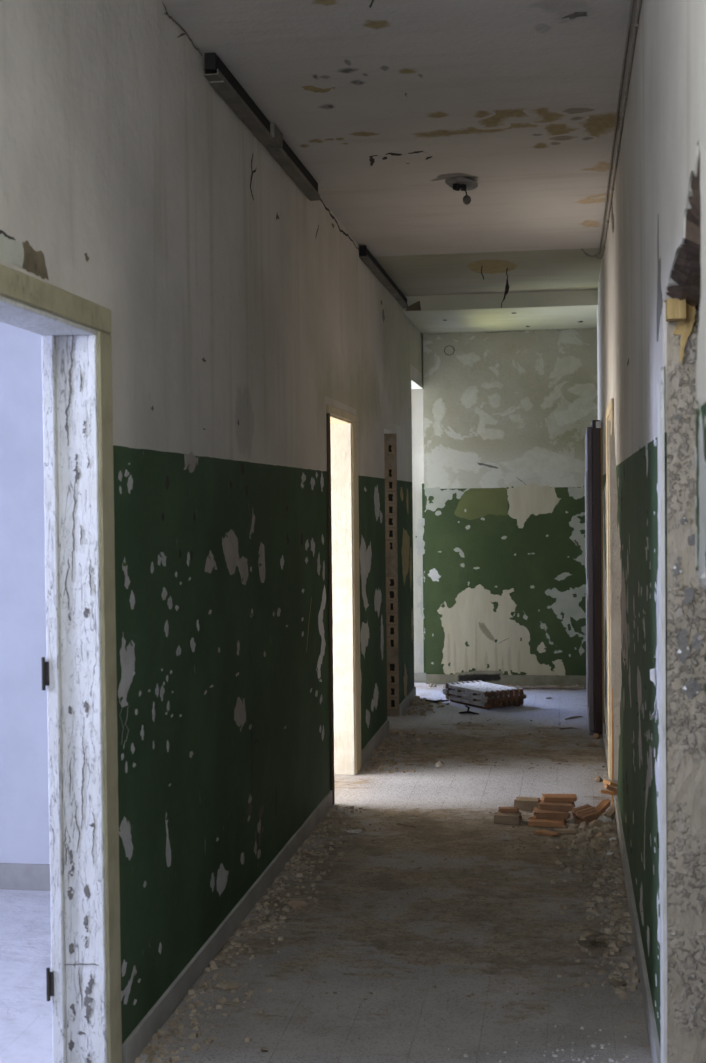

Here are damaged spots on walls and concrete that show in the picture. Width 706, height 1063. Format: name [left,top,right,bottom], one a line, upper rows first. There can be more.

damp [405,105,623,150]
crack [369,151,432,166]
spalling [118,463,133,494]
peeling [122,558,135,609]
spalling [162,587,179,637]
peeling [151,552,191,585]
spalling [176,610,212,656]
peeling [205,514,266,585]
peeling [305,534,326,704]
peeling [359,433,586,773]
peeling [672,400,706,664]
peeling [118,637,182,773]